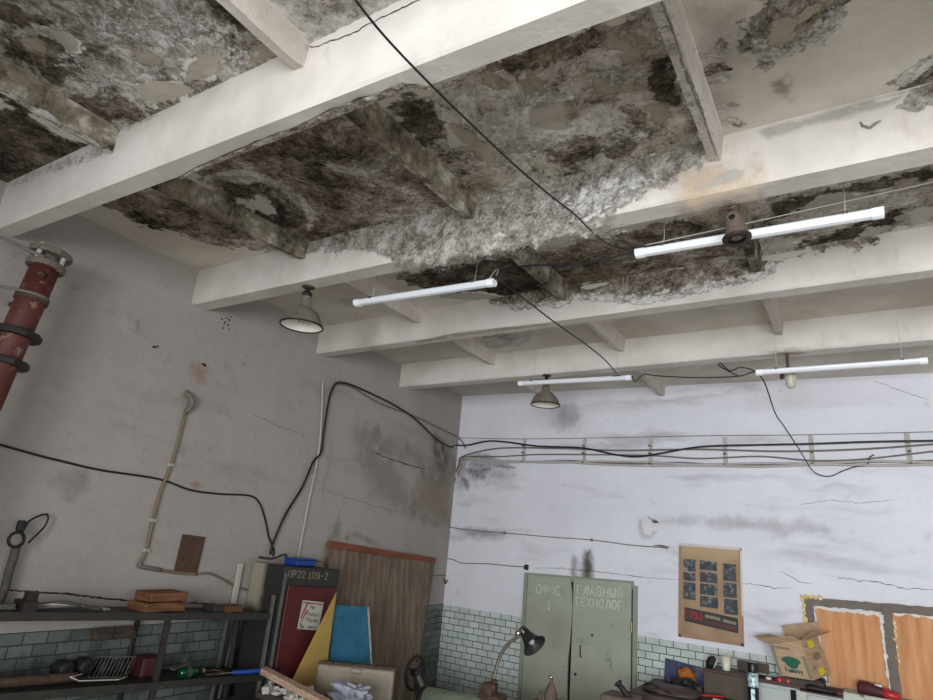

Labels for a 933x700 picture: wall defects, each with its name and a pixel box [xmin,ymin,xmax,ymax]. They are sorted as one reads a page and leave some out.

peeling [17,26,86,55]
peeling [120,34,275,110]
spalling [180,83,430,179]
peeling [444,123,469,149]
peeling [520,70,580,135]
spalling [764,83,933,135]
peeling [790,177,919,221]
peeling [855,205,933,238]
crack [321,441,445,526]
crack [838,577,932,590]